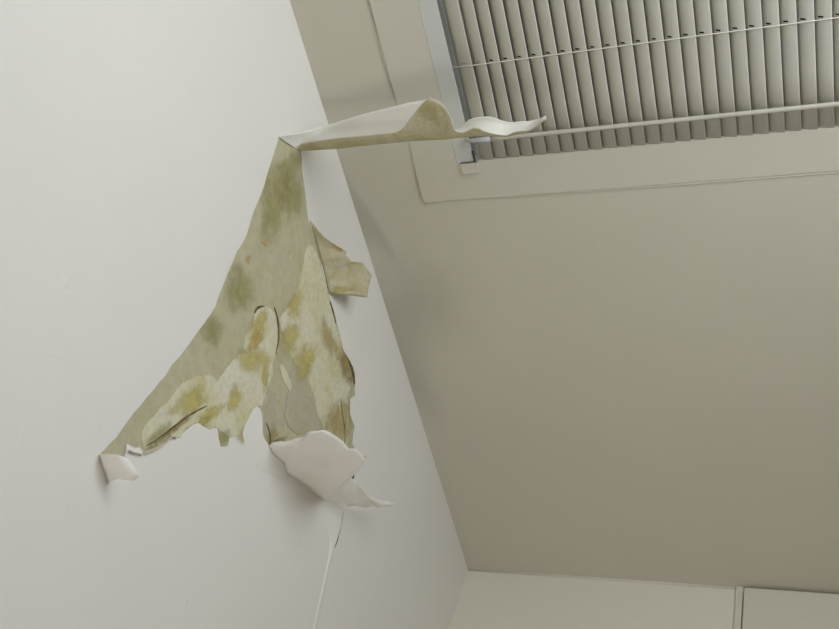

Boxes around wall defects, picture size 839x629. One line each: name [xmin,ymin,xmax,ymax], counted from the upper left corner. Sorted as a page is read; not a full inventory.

peeling [100,137,355,457]